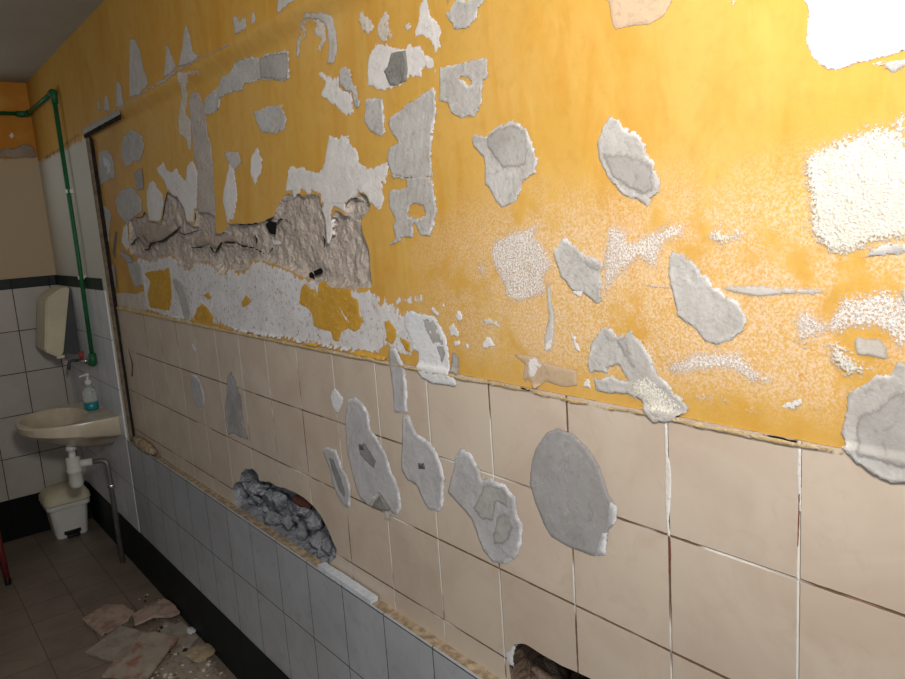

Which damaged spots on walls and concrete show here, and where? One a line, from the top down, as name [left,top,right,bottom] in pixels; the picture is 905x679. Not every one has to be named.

peeling [112,70,843,453]
spalling [233,469,337,564]
spalling [506,644,590,679]